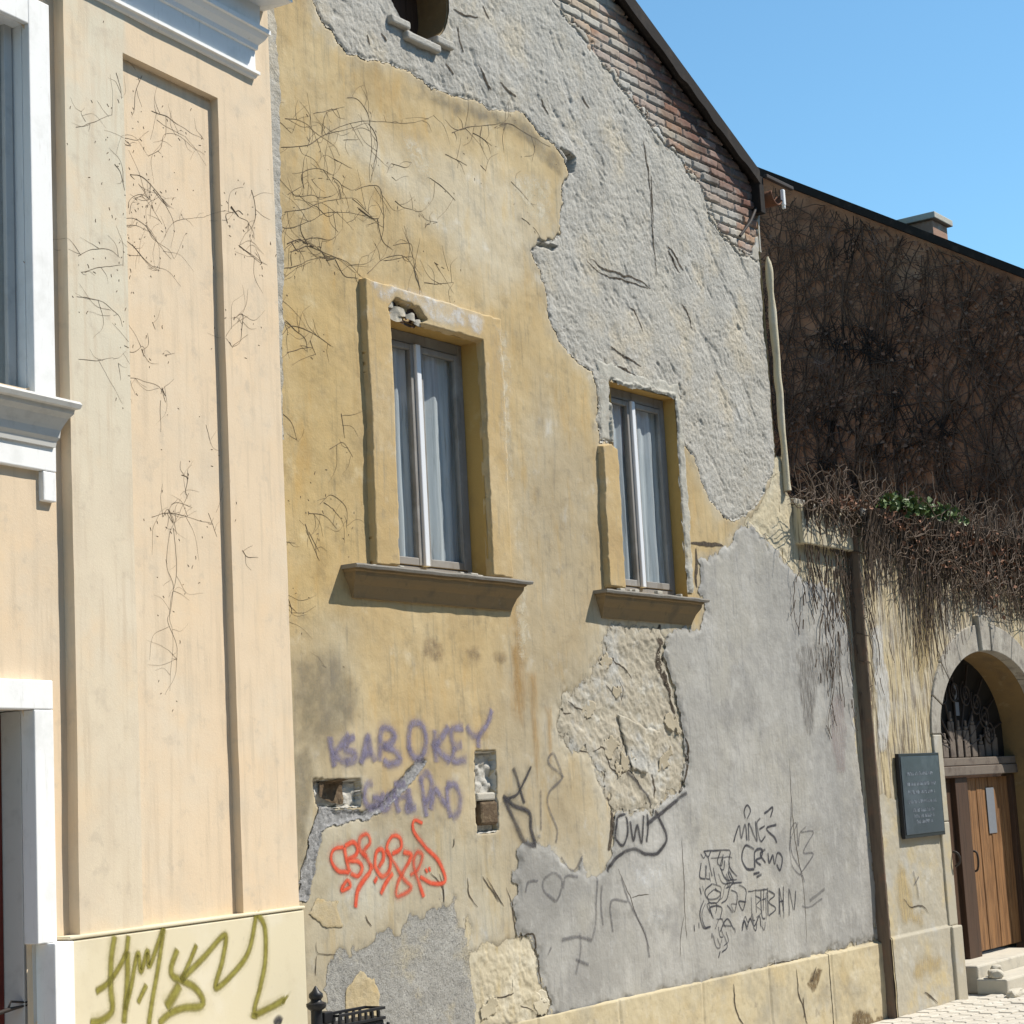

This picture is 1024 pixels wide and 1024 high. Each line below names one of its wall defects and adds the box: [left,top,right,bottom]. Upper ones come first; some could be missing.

spalling [313,0,795,571]
flaking render [556,622,687,819]
flaking render [298,757,427,902]
flaking render [324,896,553,1024]